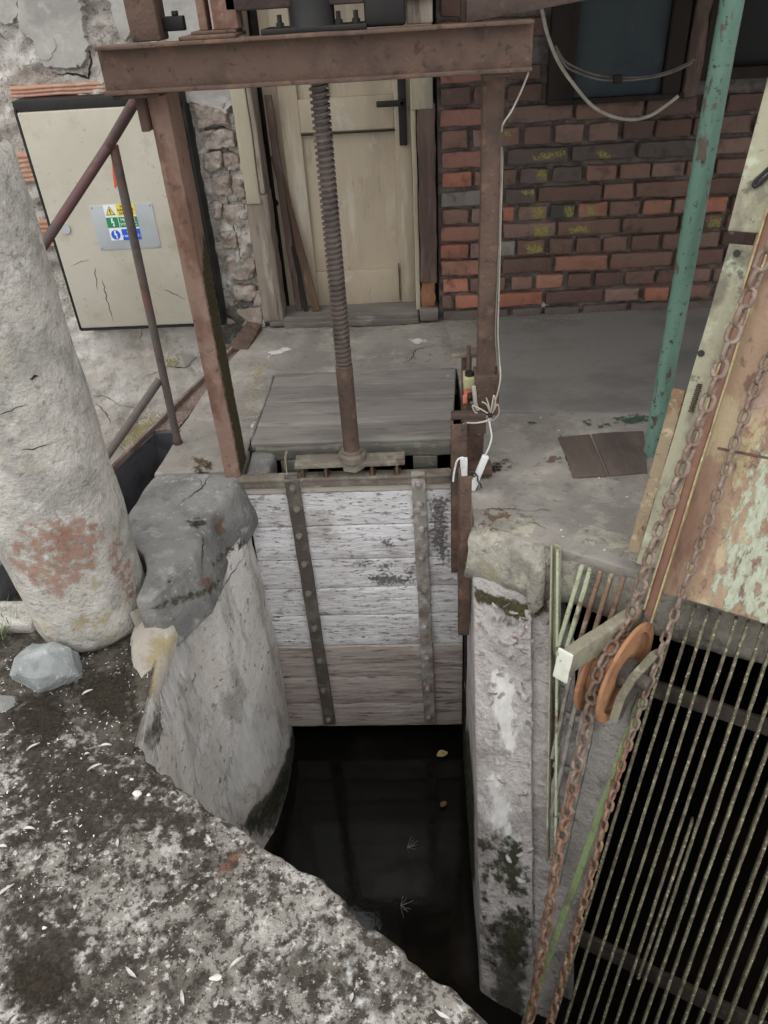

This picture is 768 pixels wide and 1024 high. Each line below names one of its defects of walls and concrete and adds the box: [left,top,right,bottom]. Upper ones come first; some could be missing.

crack [50,50,92,79]
rust [8,517,134,599]
damp [485,921,528,1018]